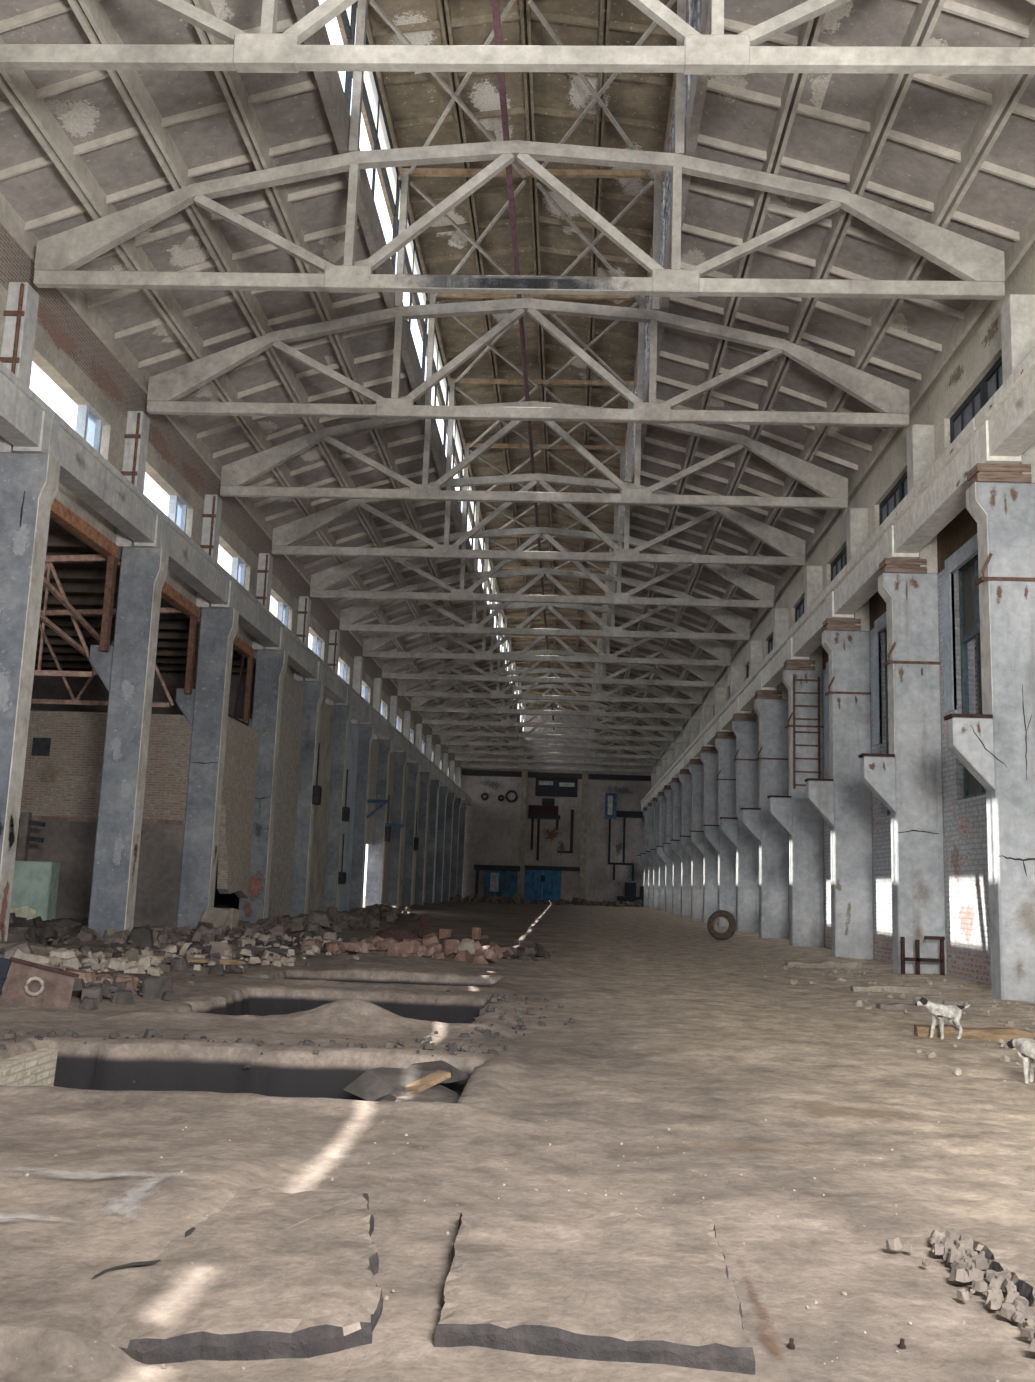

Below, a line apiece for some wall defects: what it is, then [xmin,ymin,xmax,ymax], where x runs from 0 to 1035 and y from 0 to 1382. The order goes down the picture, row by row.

peeling [45,97,102,141]
peeling [165,235,212,269]
rust [990,489,1018,512]